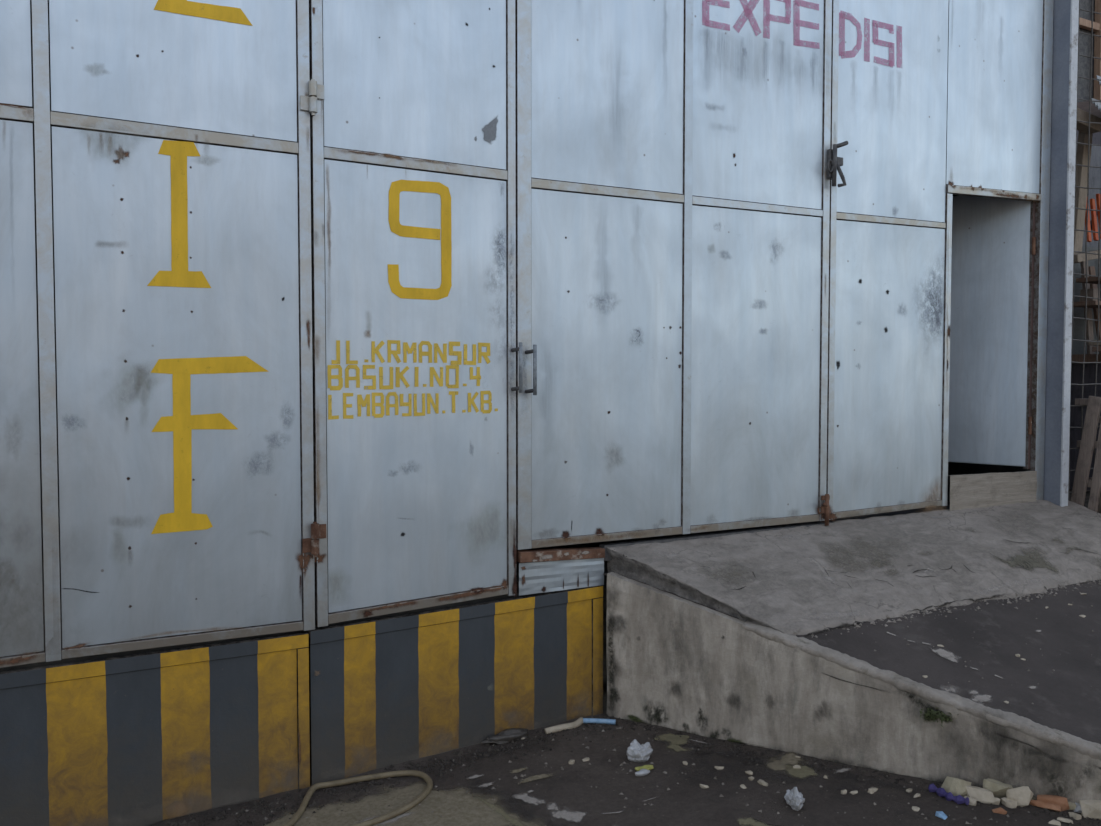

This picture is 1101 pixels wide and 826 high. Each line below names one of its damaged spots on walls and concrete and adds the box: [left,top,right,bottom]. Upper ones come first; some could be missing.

damp [628,706,662,727]